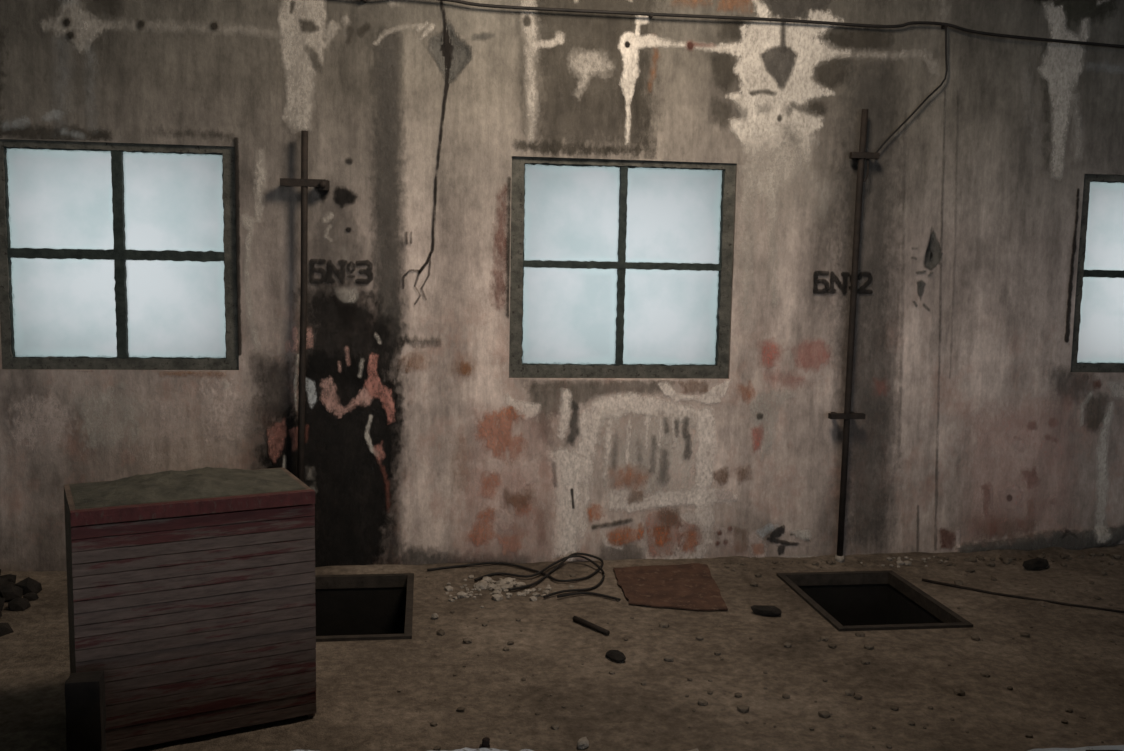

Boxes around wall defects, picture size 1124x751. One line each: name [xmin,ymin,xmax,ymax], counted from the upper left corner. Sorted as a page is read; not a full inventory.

water stain [280,0,325,122]
water stain [517,0,745,154]
water stain [762,0,828,87]
water stain [1038,0,1115,177]
peeling [289,326,395,508]
peeling [469,406,539,551]
peeling [588,505,700,556]